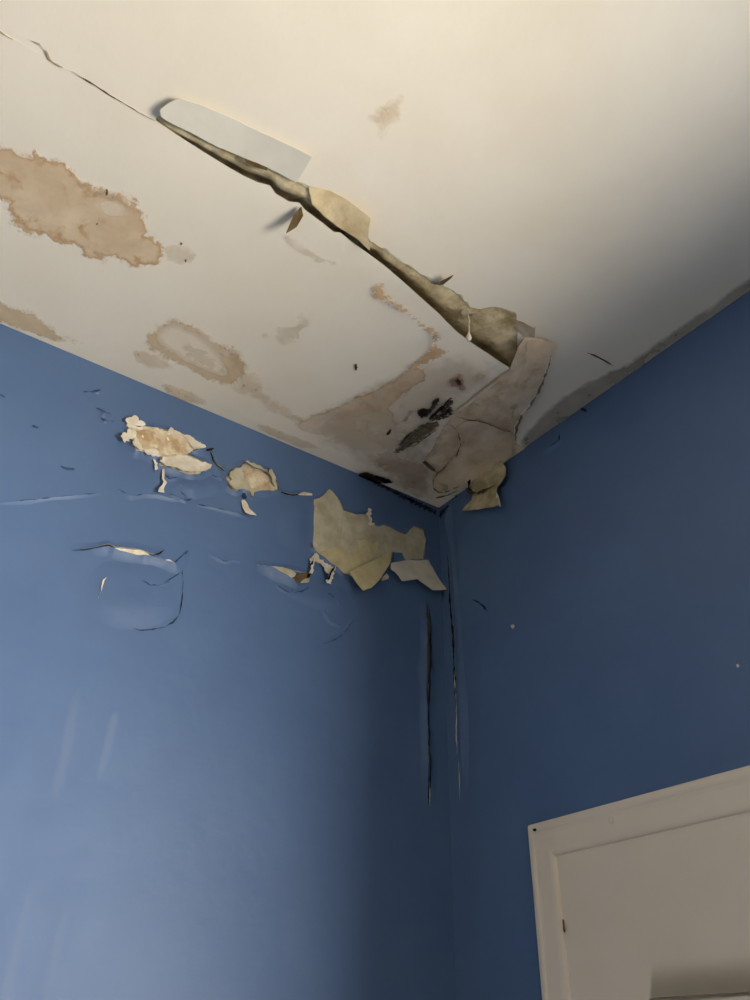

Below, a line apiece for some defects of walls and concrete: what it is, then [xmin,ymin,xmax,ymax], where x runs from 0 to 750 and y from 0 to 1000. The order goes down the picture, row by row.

crack [0,31,153,120]
damp [0,149,163,267]
peeling [286,207,303,233]
damp [374,284,407,312]
peeling [120,415,283,515]
peeling [306,485,447,591]
damp [336,325,446,410]
damp [358,472,457,518]
damp [393,397,454,453]
damp [452,374,465,391]
peeling [422,320,555,511]
crack [417,600,437,808]